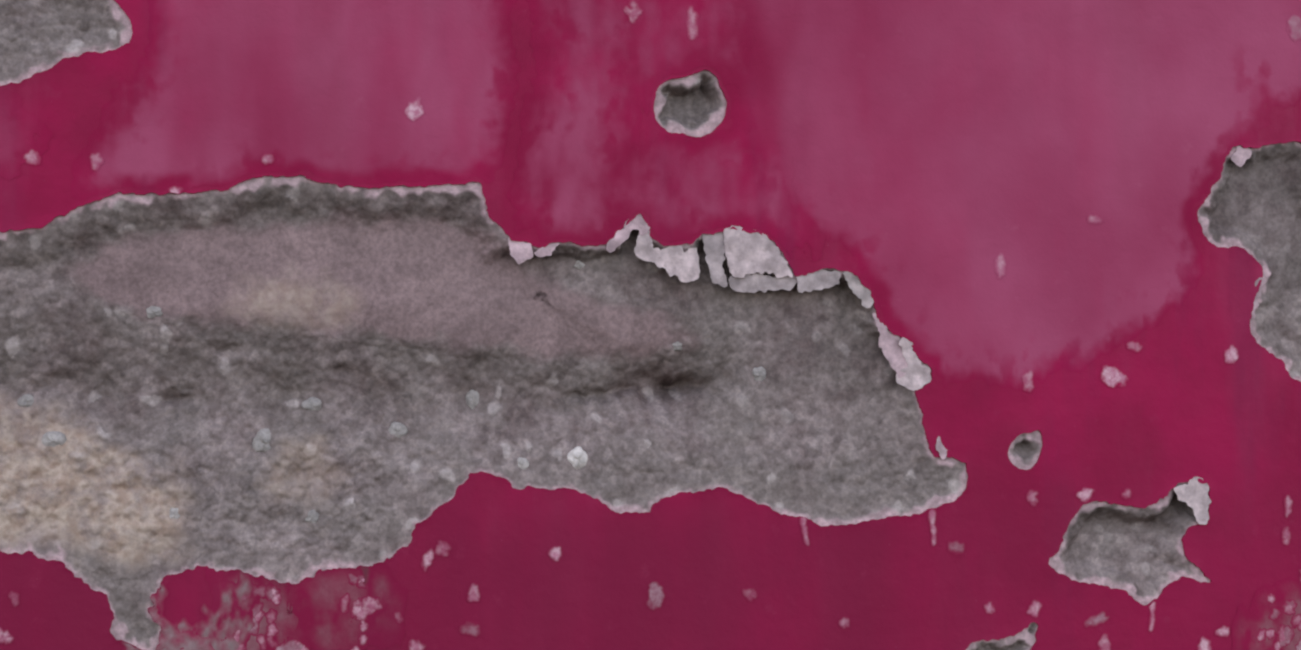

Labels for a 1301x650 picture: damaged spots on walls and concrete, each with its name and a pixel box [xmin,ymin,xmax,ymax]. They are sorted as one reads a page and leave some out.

spalling [0,0,133,86]
spalling [654,70,727,137]
peeling [23,149,42,166]
spalling [1197,141,1301,382]
spalling [0,152,968,650]
spalling [1008,430,1042,470]
spalling [1048,477,1211,605]
spalling [966,599,1043,650]